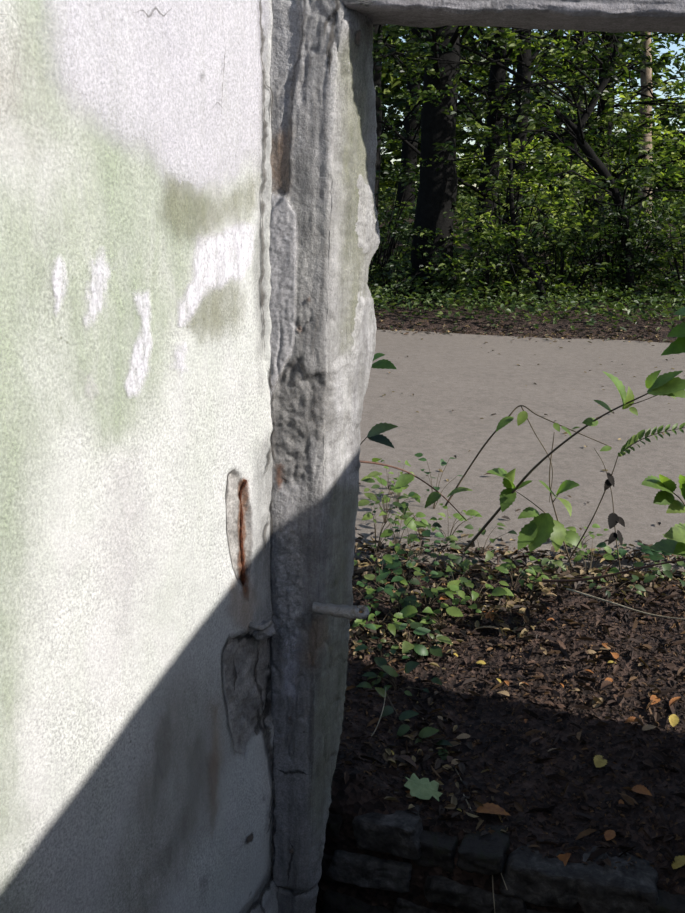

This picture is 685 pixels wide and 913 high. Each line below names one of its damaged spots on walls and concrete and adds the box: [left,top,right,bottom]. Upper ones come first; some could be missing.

crack [259,0,340,561]
spalling [225,470,252,598]
crack [247,638,309,913]